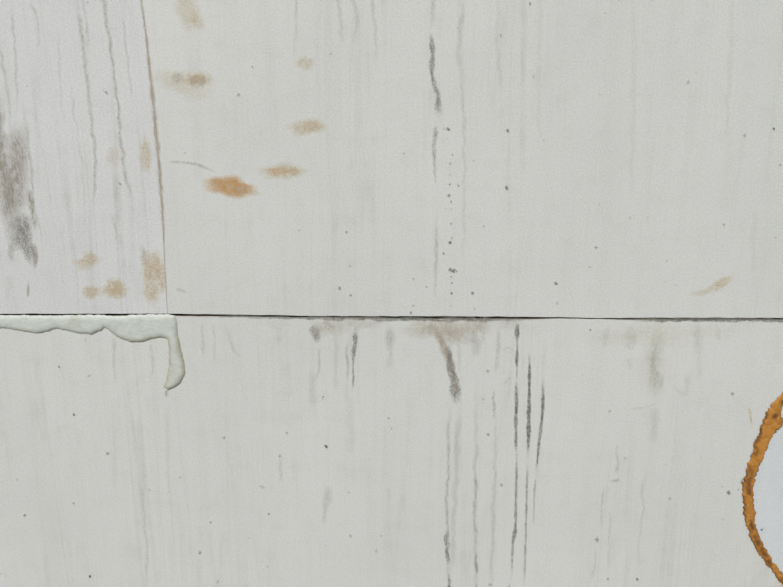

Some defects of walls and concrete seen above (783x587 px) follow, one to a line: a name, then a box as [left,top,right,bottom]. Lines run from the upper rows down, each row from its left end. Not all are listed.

water stain [0,135,37,263]
corrosion [211,177,252,197]
water stain [436,332,460,397]
water stain [514,363,545,464]
water stain [511,468,528,563]